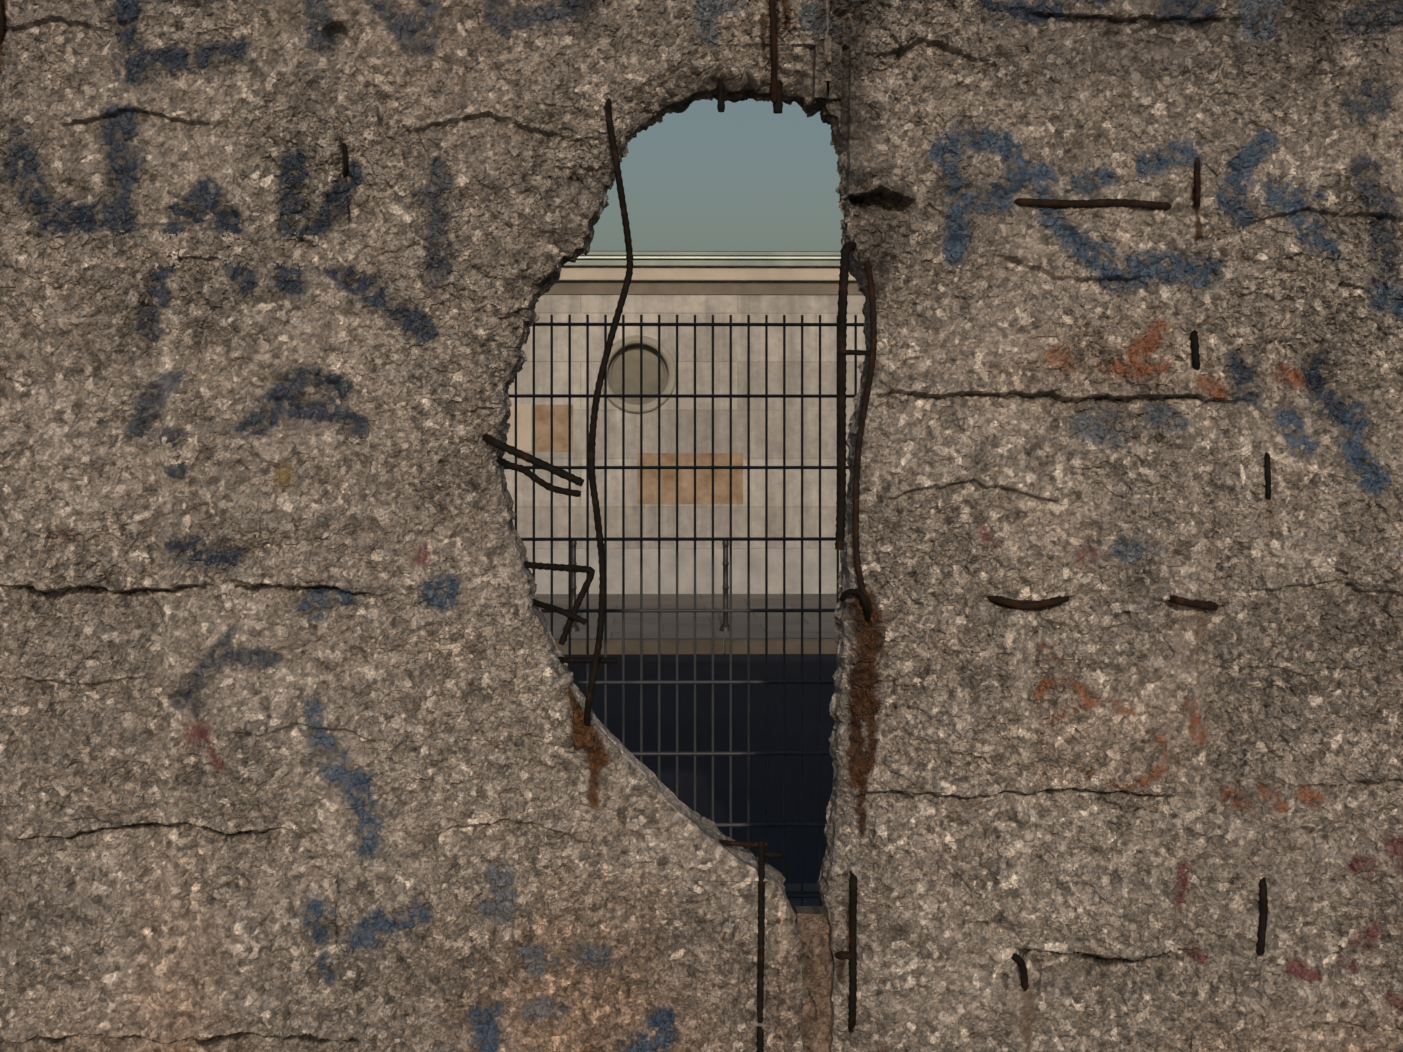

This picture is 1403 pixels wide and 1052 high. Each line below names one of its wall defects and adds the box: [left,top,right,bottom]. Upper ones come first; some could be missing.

rust [761,0,792,65]
spalling [639,43,834,119]
spalling [486,167,599,377]
crack [880,389,1211,416]
crack [9,586,197,631]
crack [235,584,365,595]
rust [848,590,884,836]
rust [568,687,608,807]
crack [67,818,269,839]
spalling [568,720,769,900]
crack [1070,948,1181,965]
crack [1,1032,356,1045]